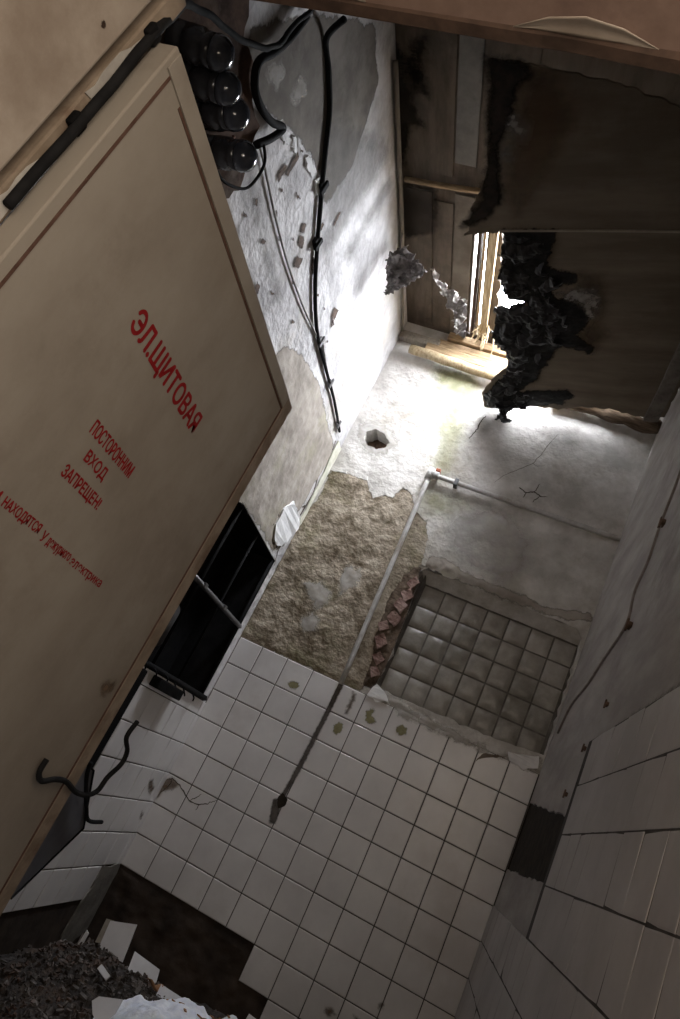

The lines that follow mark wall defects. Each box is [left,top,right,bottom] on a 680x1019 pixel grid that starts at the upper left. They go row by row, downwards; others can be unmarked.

flaking render [239,346,592,703]
peeling [0,900,81,955]
peeling [72,864,268,1019]